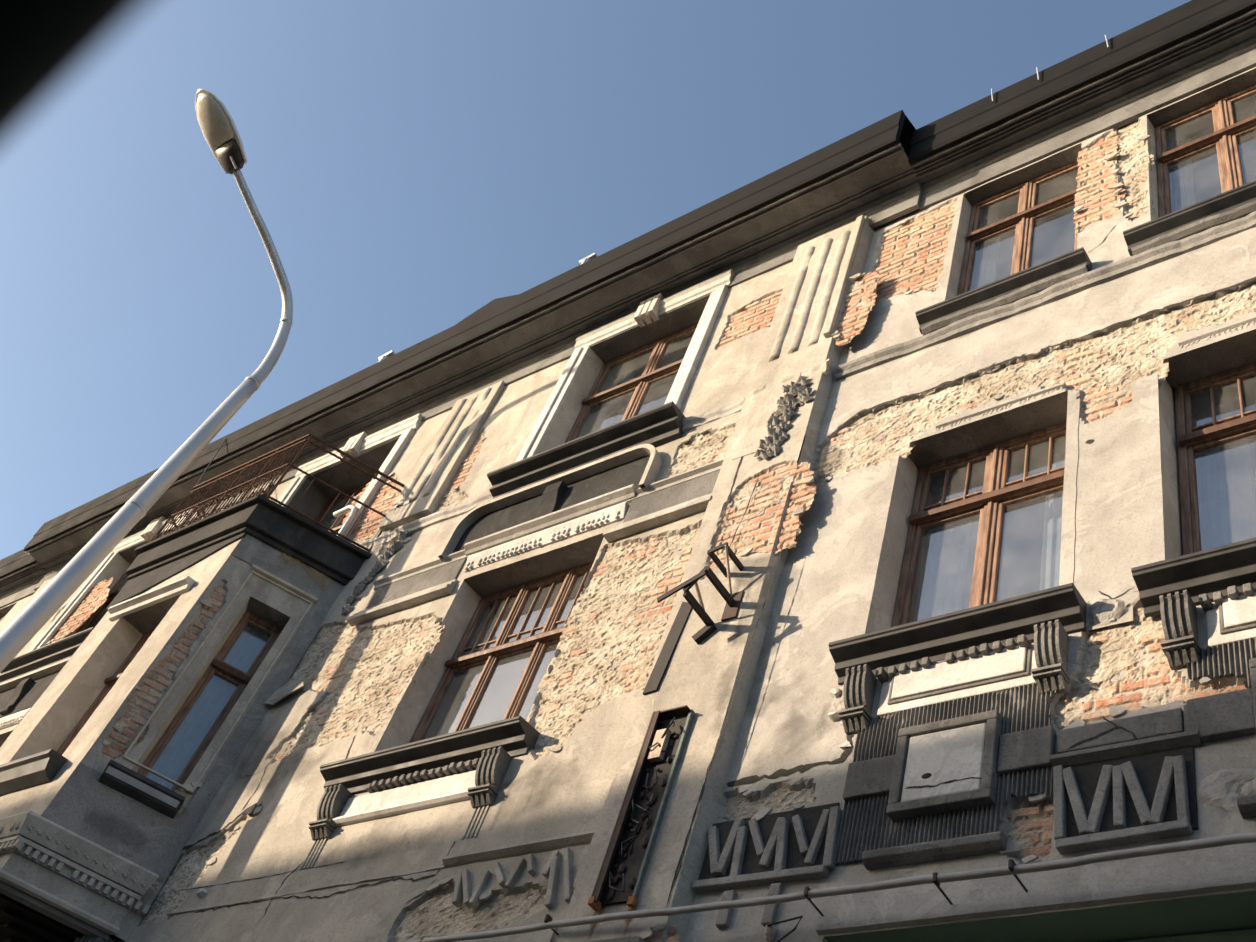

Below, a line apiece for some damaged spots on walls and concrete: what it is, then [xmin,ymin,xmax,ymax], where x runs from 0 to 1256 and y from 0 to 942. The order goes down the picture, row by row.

flaking render [1073,120,1155,236]
flaking render [830,201,957,346]
spalling [704,284,1256,578]
flaking render [102,581,227,760]
spalling [264,616,446,761]
spalling [533,529,699,757]
spalling [1054,606,1246,737]
crack [182,710,308,850]
spalling [138,804,263,926]
crack [173,840,455,924]
spalling [394,877,546,942]